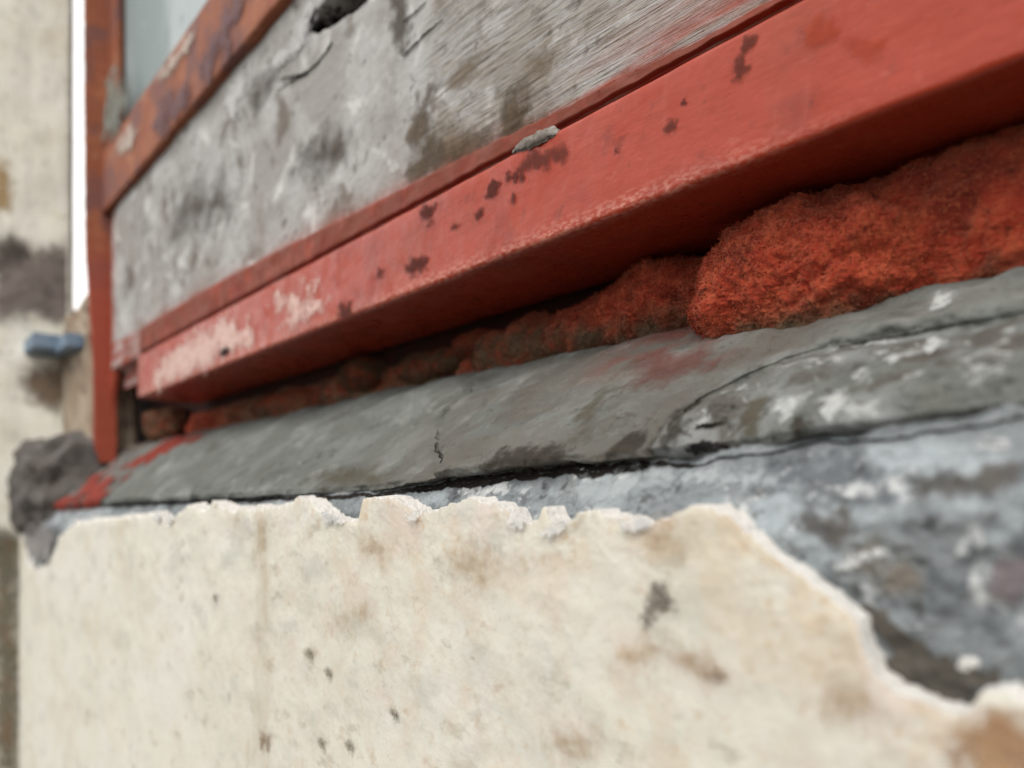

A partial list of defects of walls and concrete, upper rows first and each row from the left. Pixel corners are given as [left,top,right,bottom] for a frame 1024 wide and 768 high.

peeling [265,0,317,76]
damp [0,237,27,260]
peeling [275,279,321,328]
peeling [154,318,254,394]
crack [81,415,1024,509]
damp [912,463,1019,496]
peeling [20,403,1024,716]
damp [836,548,888,572]
damp [957,521,983,556]